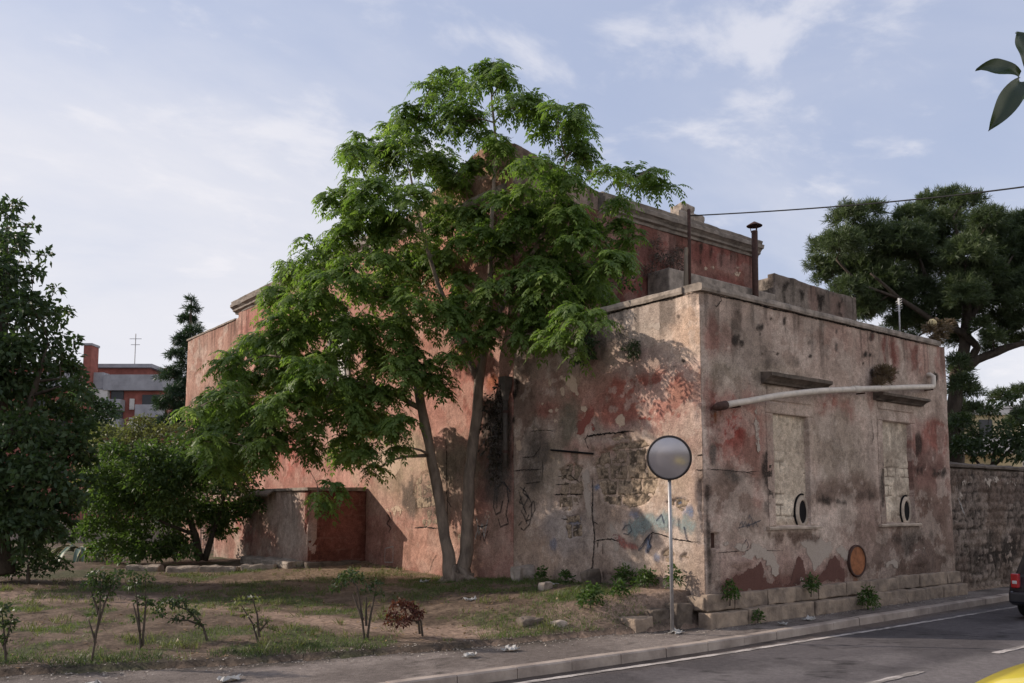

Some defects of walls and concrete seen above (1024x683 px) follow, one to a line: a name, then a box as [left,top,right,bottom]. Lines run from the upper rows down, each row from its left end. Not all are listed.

damp [863,331,896,379]
spalling [559,414,658,538]
spalling [667,498,701,511]
peeling [722,534,848,592]